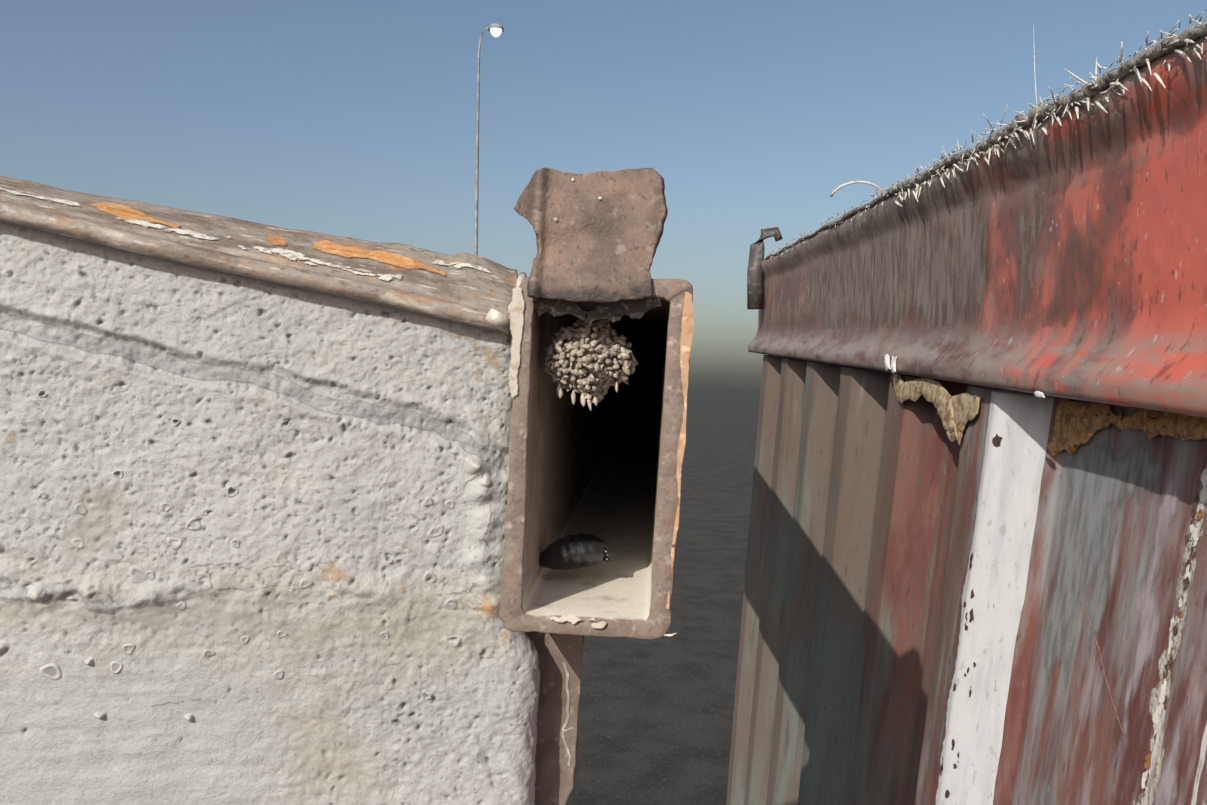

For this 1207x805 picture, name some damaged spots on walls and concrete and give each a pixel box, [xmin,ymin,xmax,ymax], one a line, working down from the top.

rust [92,202,180,228]
rust [312,240,445,275]
peeling [934,395,958,440]
crack [463,433,492,557]
crack [0,577,137,608]
crack [185,562,312,596]
peeling [1133,466,1207,805]